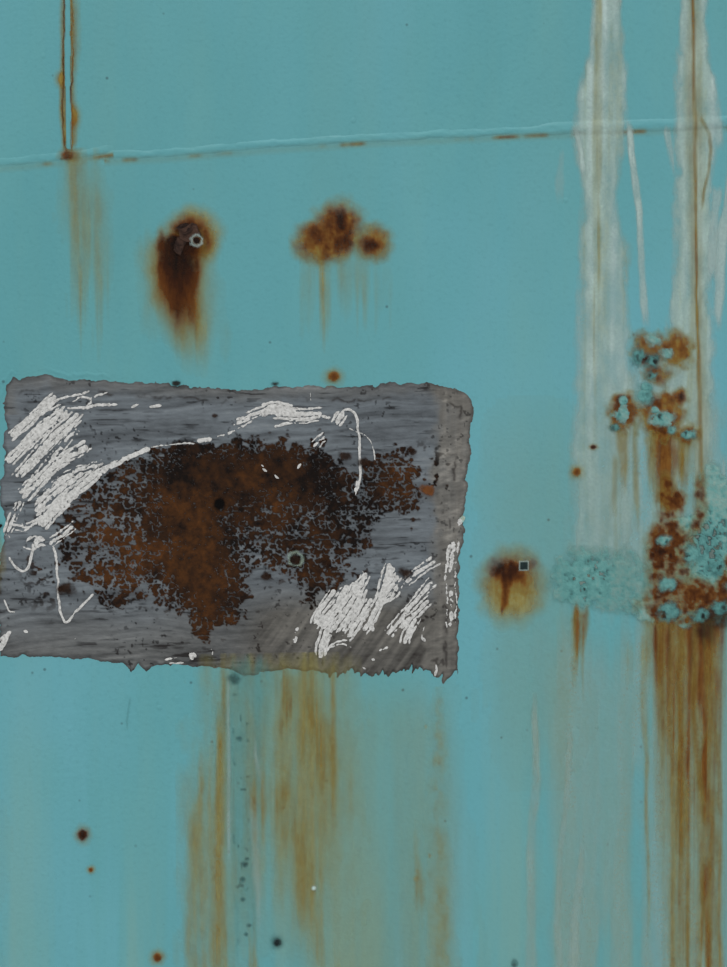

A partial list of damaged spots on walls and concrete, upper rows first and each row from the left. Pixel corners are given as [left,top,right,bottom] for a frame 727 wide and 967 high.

rust [155,210,217,331]
rust [295,203,389,295]
damp [574,0,661,571]
damp [653,0,727,489]
rust [607,330,700,509]
rust [27,433,448,644]
rust [484,555,538,616]
rust [213,740,222,962]
rust [646,617,724,967]